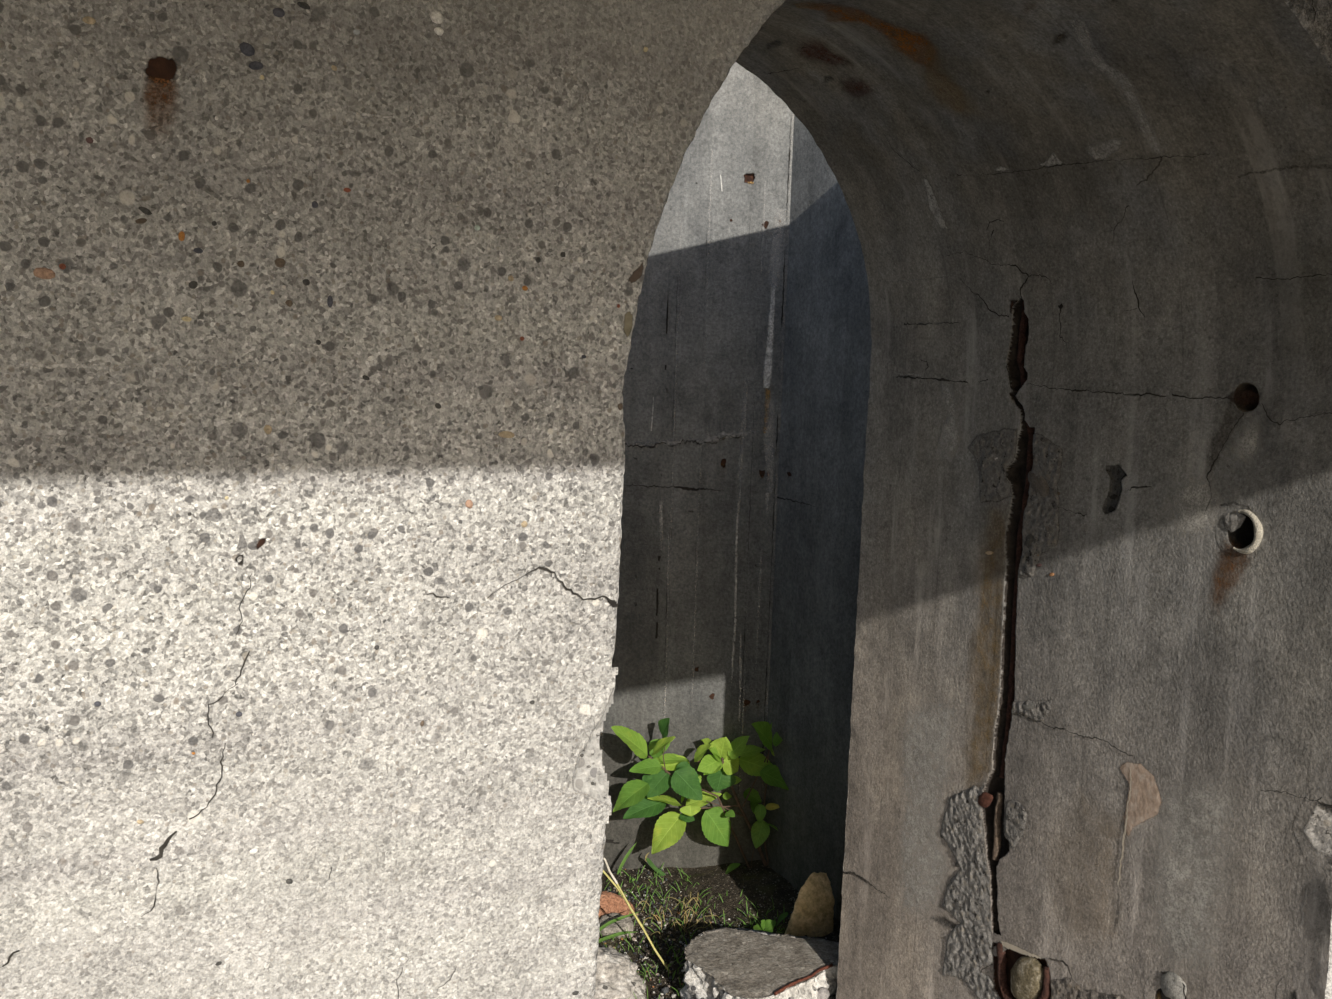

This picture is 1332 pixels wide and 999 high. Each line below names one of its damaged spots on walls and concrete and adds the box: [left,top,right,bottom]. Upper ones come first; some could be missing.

corrosion [145,56,177,122]
crack [625,431,747,448]
crack [488,566,619,607]
crack [947,219,1133,957]
spalling [1011,699,1053,721]
crack [141,574,252,917]
spalling [926,785,1126,999]